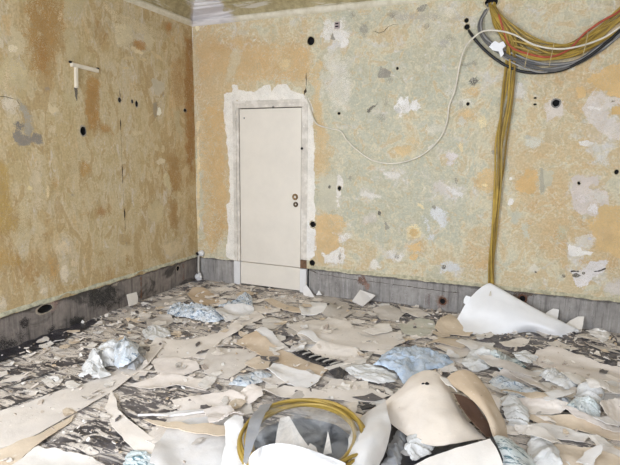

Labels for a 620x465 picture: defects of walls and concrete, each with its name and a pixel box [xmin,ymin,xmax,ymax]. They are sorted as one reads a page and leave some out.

spalling [307,34,349,48]
peeling [367,96,421,118]
flaking render [579,92,620,175]
peeling [570,174,611,216]
flaking render [307,220,486,287]
flaking render [495,224,620,302]
leakage [88,286,124,311]